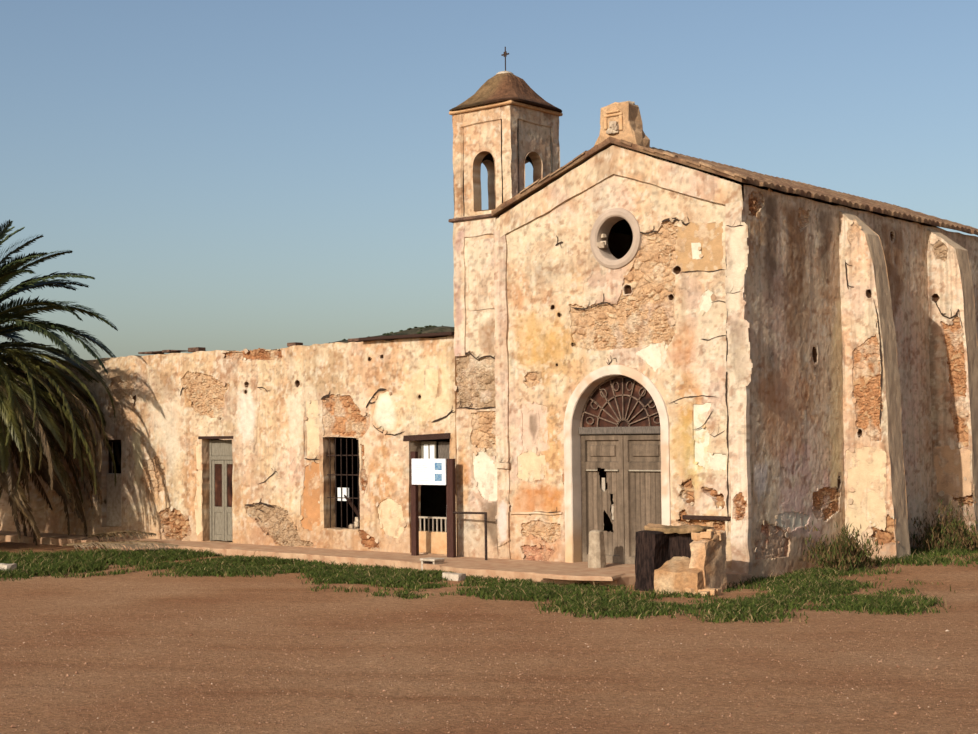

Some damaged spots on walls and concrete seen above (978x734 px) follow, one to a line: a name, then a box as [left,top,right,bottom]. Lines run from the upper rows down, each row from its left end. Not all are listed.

flaking render [550,216,723,372]
flaking render [106,377,137,426]
flaking render [142,456,166,492]
flaking render [160,441,203,540]
flaking render [245,395,371,547]
flaking render [359,498,407,549]
flaking render [453,351,497,501]
crack [668,259,741,516]
flaking render [693,403,727,471]
flaking render [676,479,747,531]
flaking render [754,335,899,560]
flaking render [933,317,976,508]